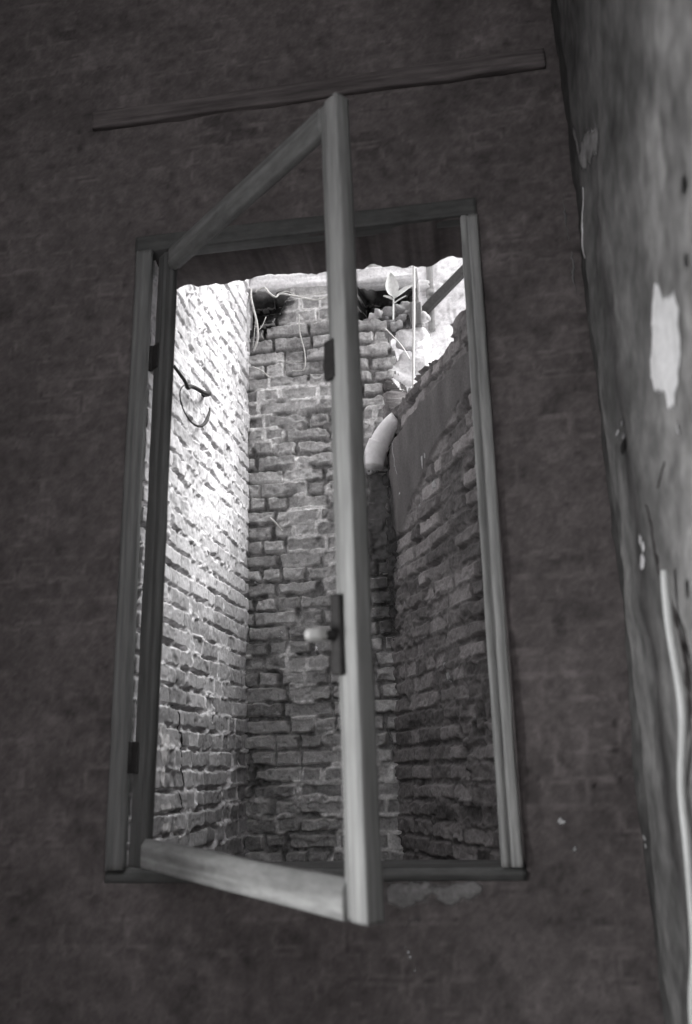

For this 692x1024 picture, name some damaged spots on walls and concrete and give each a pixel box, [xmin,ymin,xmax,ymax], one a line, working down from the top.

flaking render [573,127,598,171]
peeling [650,283,681,409]